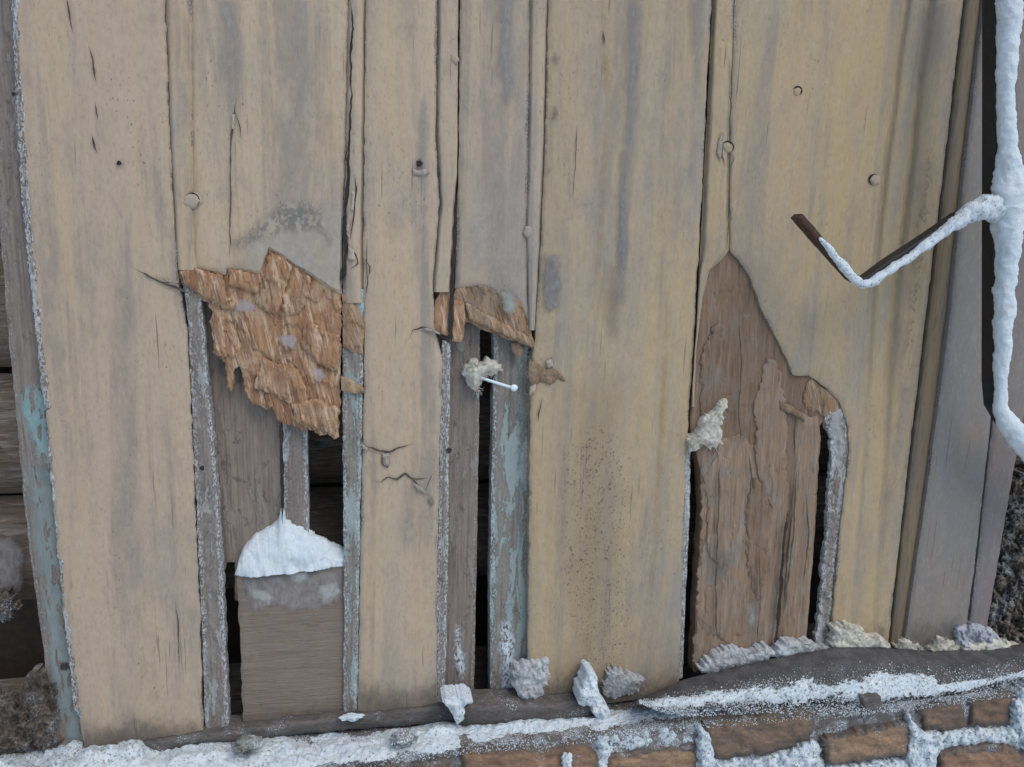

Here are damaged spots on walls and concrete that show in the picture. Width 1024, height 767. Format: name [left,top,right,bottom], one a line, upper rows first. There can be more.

crack [229,100,241,254]
peeling [250,204,365,355]
peeling [699,322,726,415]
peeling [22,386,83,739]
crack [362,443,433,498]
peeling [701,357,788,644]